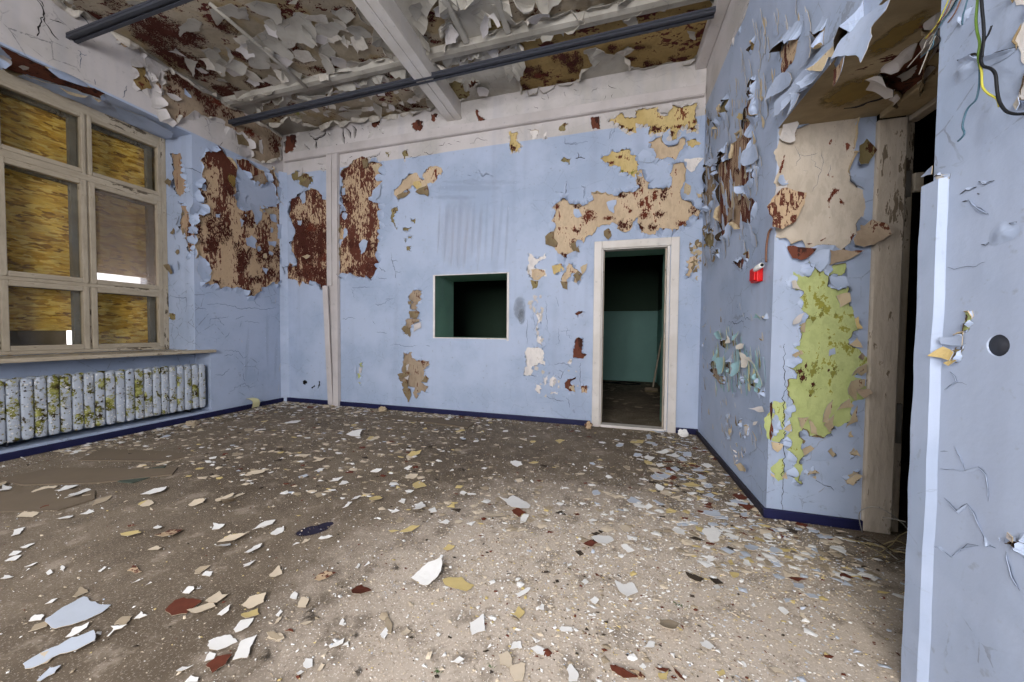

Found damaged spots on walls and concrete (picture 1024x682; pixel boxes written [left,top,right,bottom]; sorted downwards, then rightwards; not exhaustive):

crack [37,0,96,84]
peeling [409,0,714,101]
peeling [0,0,443,301]
peeling [508,122,568,154]
peeling [523,0,891,492]
peeling [402,288,424,337]
peeling [397,351,432,402]
peeling [928,310,975,366]
crack [935,446,1020,591]